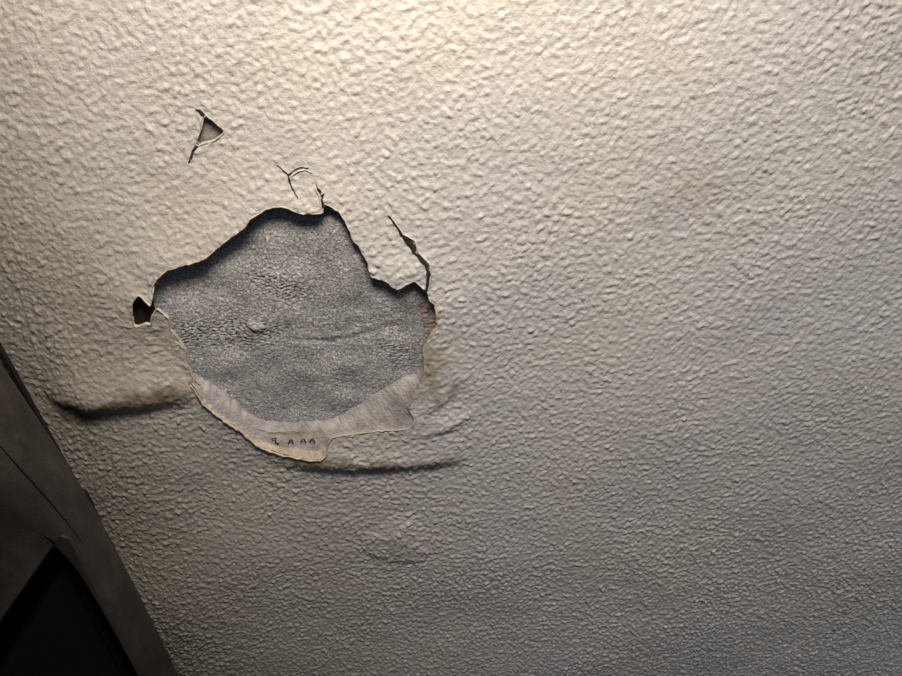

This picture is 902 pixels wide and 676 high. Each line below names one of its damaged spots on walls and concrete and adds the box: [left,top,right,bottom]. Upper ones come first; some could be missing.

peeling [188,109,225,163]
crack [388,215,432,292]
peeling [131,204,443,462]